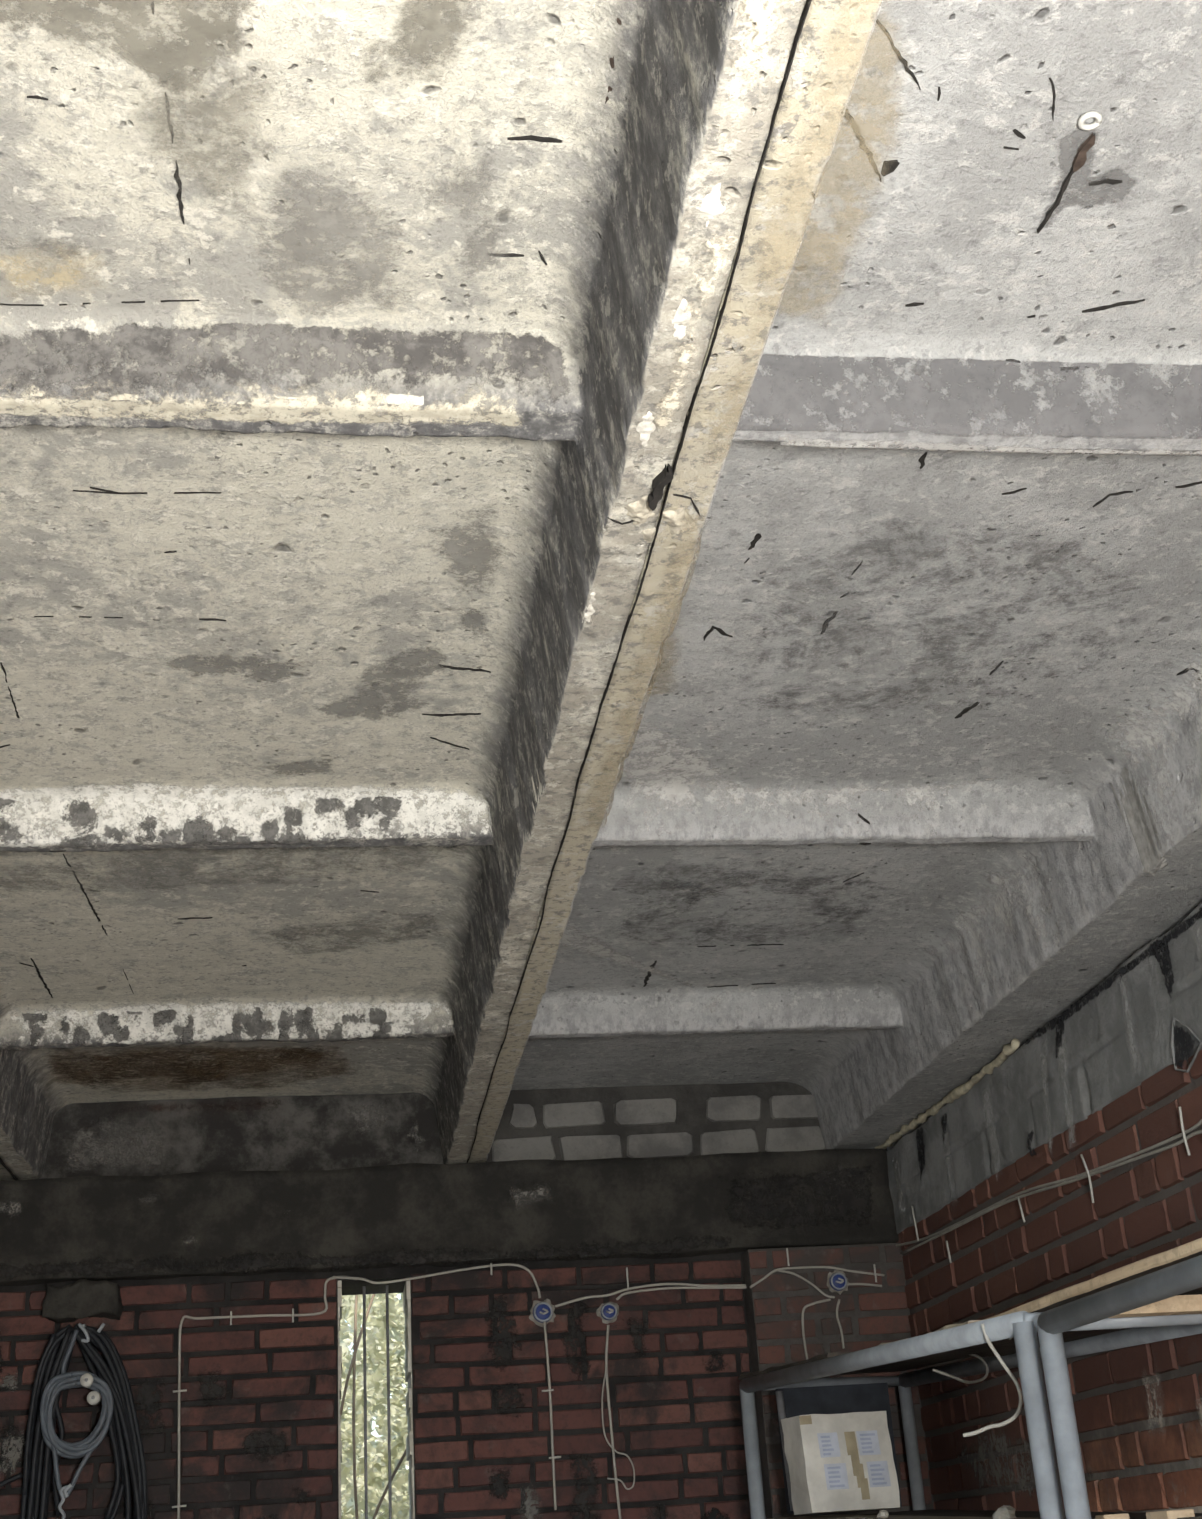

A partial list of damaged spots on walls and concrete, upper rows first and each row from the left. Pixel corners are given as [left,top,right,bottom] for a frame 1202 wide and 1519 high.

water stain [366,0,472,82]
water stain [0,0,262,193]
crack [1044,61,1056,121]
water stain [0,162,569,406]
crack [1082,299,1145,313]
crack [73,486,221,494]
crack [1093,481,1202,507]
crack [467,0,812,1163]
water stain [320,649,446,719]
peeling [0,782,495,849]
peeling [10,1000,454,1046]
corrosion [48,1046,348,1112]